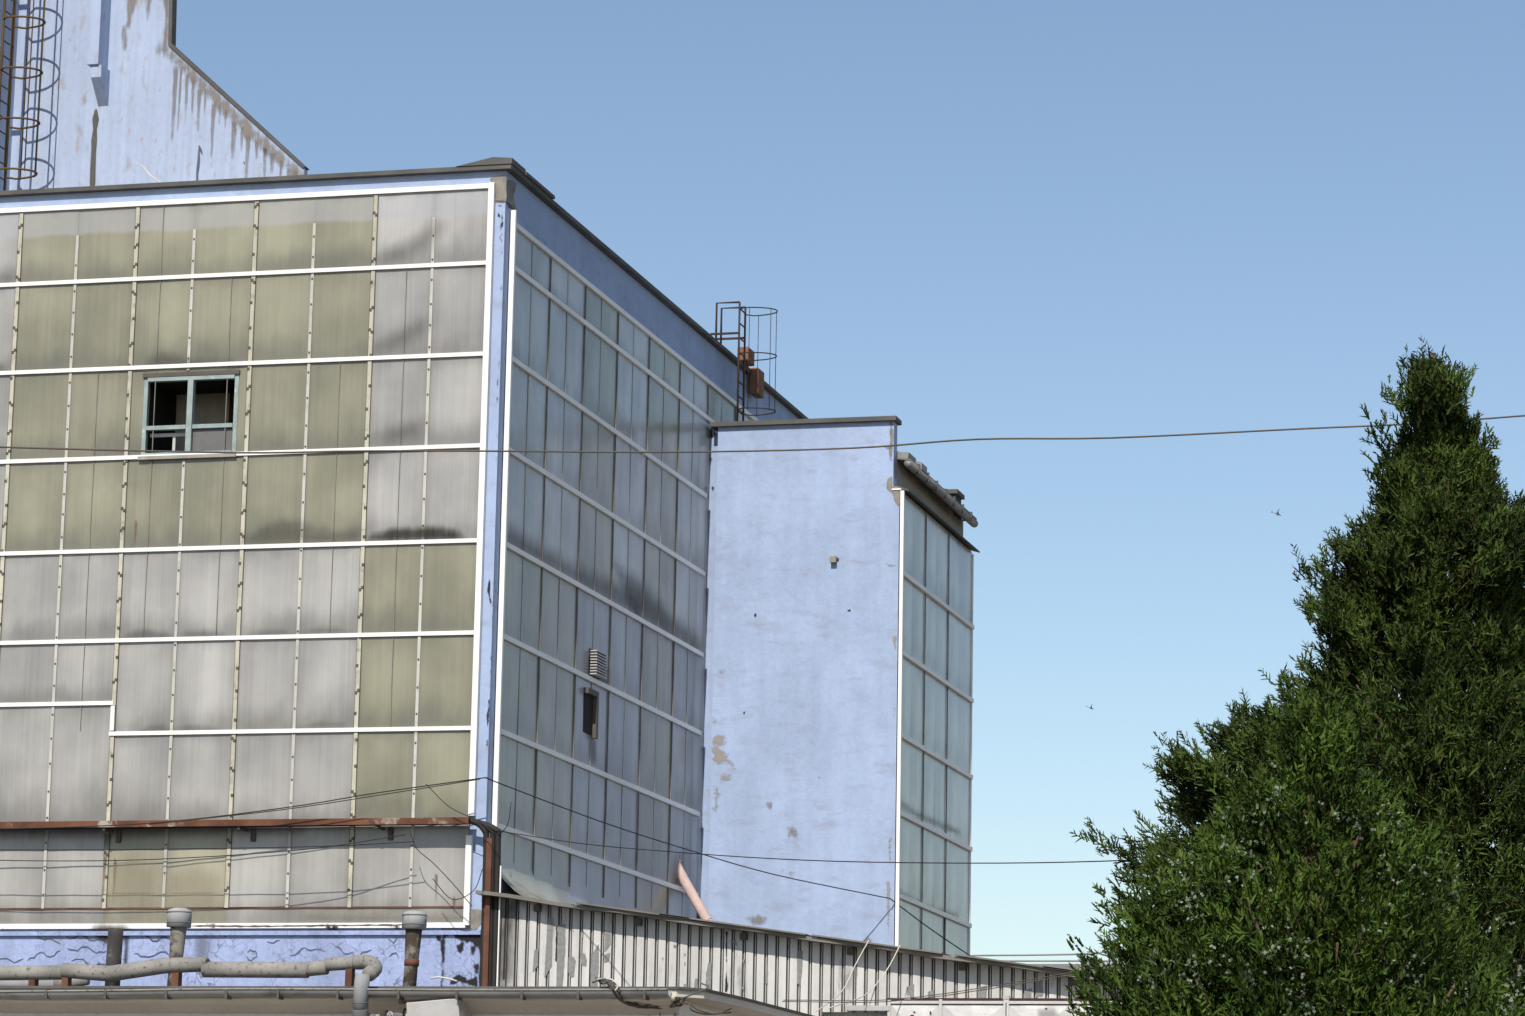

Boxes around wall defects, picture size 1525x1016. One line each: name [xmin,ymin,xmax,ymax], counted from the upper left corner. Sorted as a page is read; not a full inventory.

water stain [122,0,302,176]
peeling [712,735,733,807]